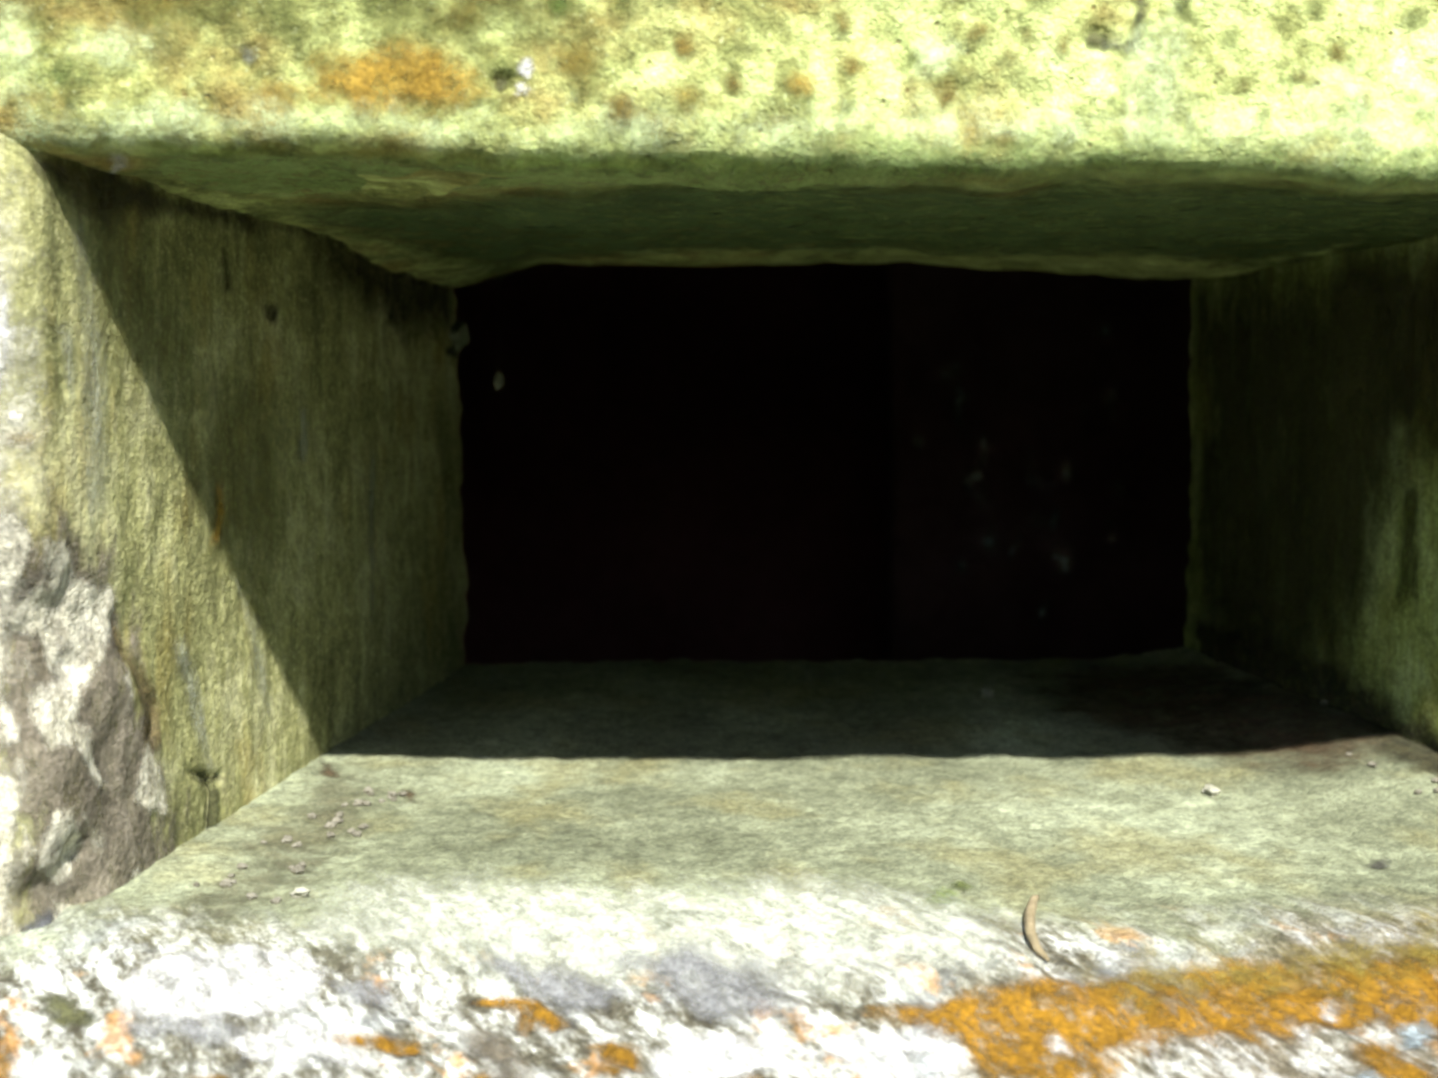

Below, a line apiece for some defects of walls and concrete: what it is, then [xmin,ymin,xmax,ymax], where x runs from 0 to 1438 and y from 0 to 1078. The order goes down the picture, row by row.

crack [1130,0,1197,51]
water stain [1196,250,1438,753]